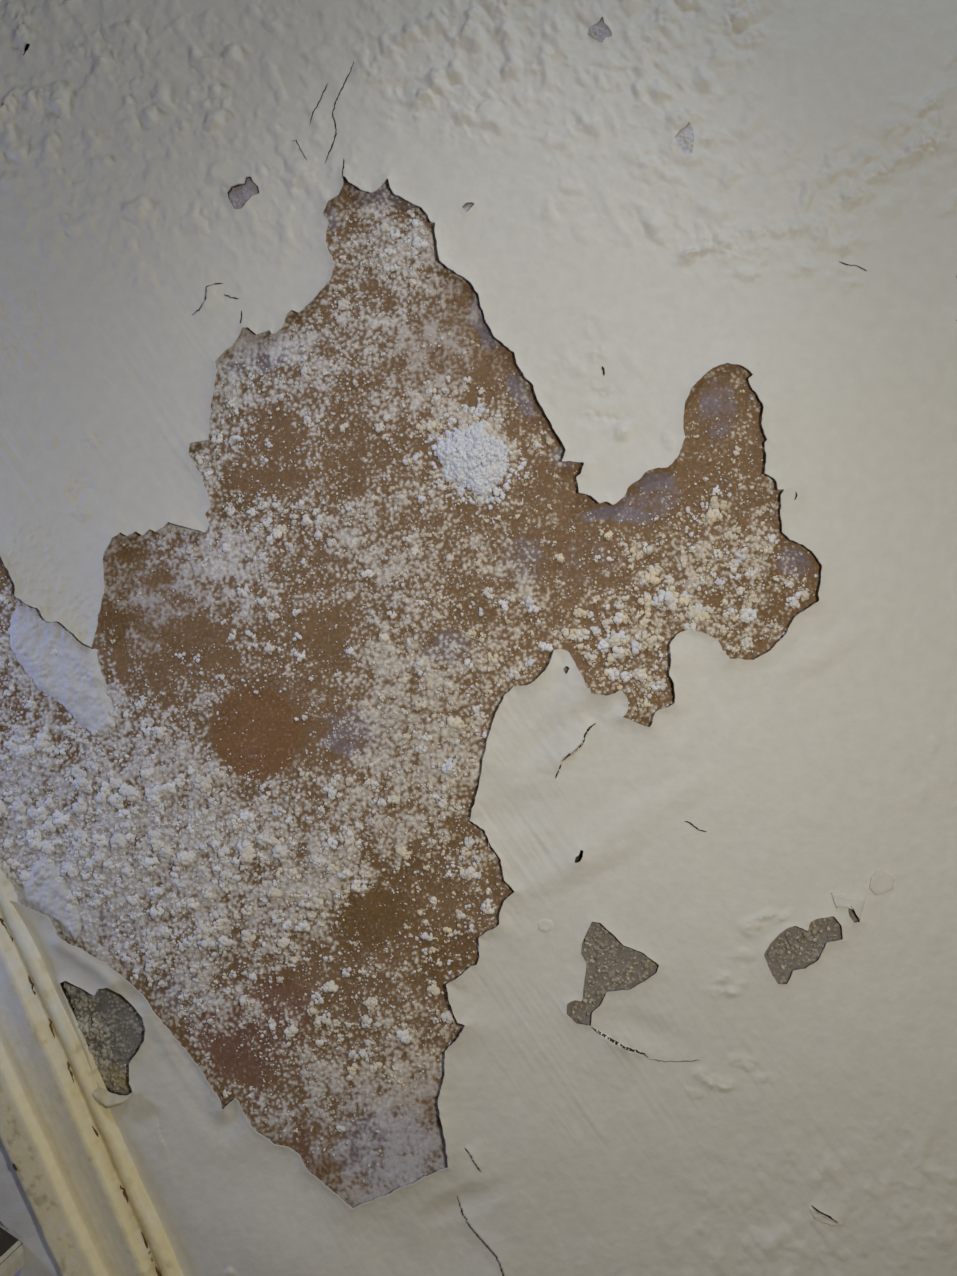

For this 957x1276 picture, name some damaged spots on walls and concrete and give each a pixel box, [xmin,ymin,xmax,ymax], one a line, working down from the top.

water stain [428,403,527,510]
peeling [0,160,838,1224]
peeling [756,893,867,991]